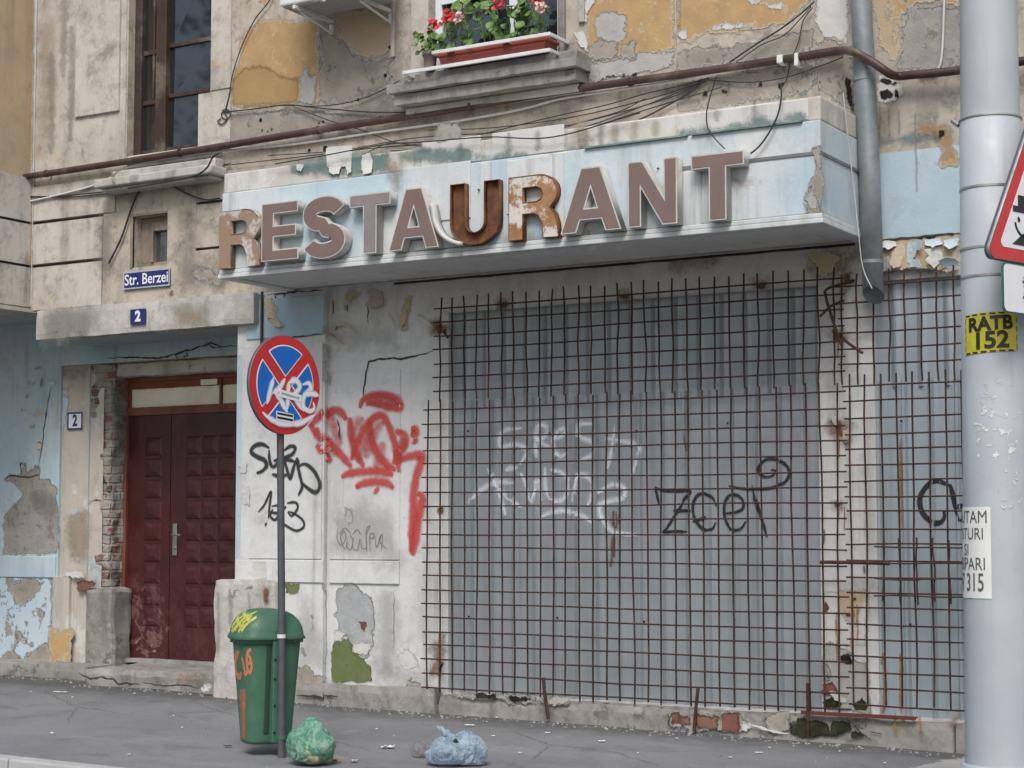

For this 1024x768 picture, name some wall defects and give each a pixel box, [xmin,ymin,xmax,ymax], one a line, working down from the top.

spalling [231,29,398,141]
spalling [587,0,855,112]
spalling [876,2,960,104]
peeling [289,145,389,177]
peeling [883,234,960,273]
crack [112,342,236,359]
crack [363,351,432,397]
corrosion [830,421,847,455]
spalling [2,462,59,556]
peeling [0,570,96,662]
spalling [297,582,375,684]
spalling [765,588,872,741]